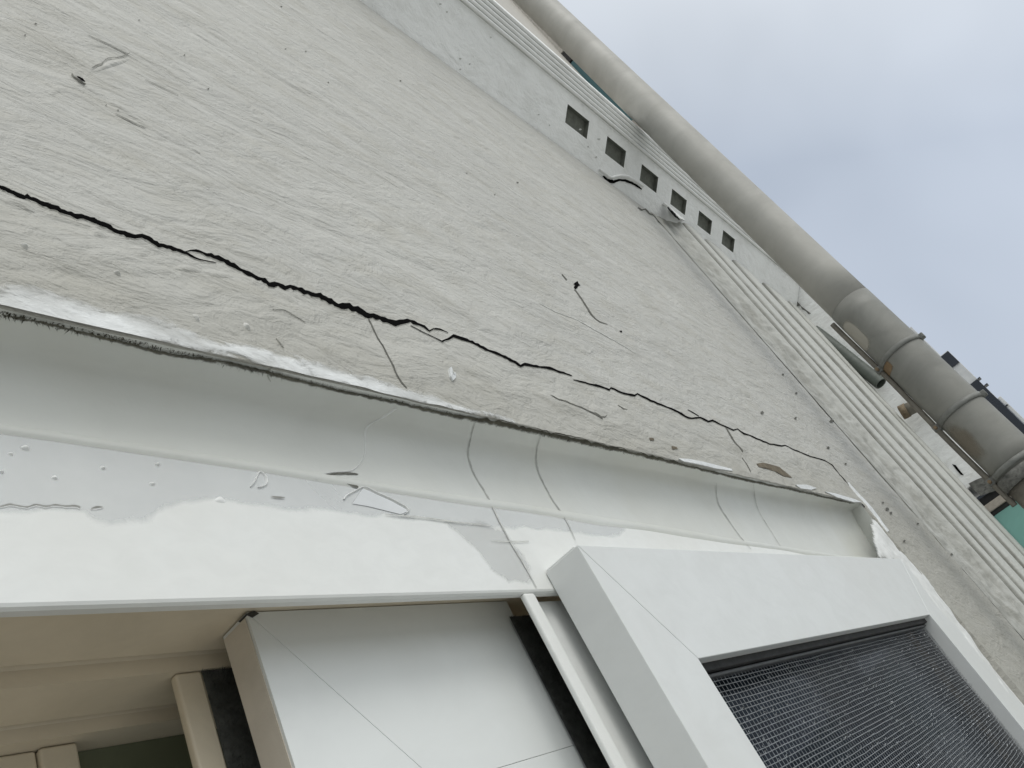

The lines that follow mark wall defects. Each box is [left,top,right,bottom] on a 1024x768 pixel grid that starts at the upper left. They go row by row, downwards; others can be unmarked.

peeling [0,285,514,514]
crack [0,185,849,545]
crack [386,421,537,587]